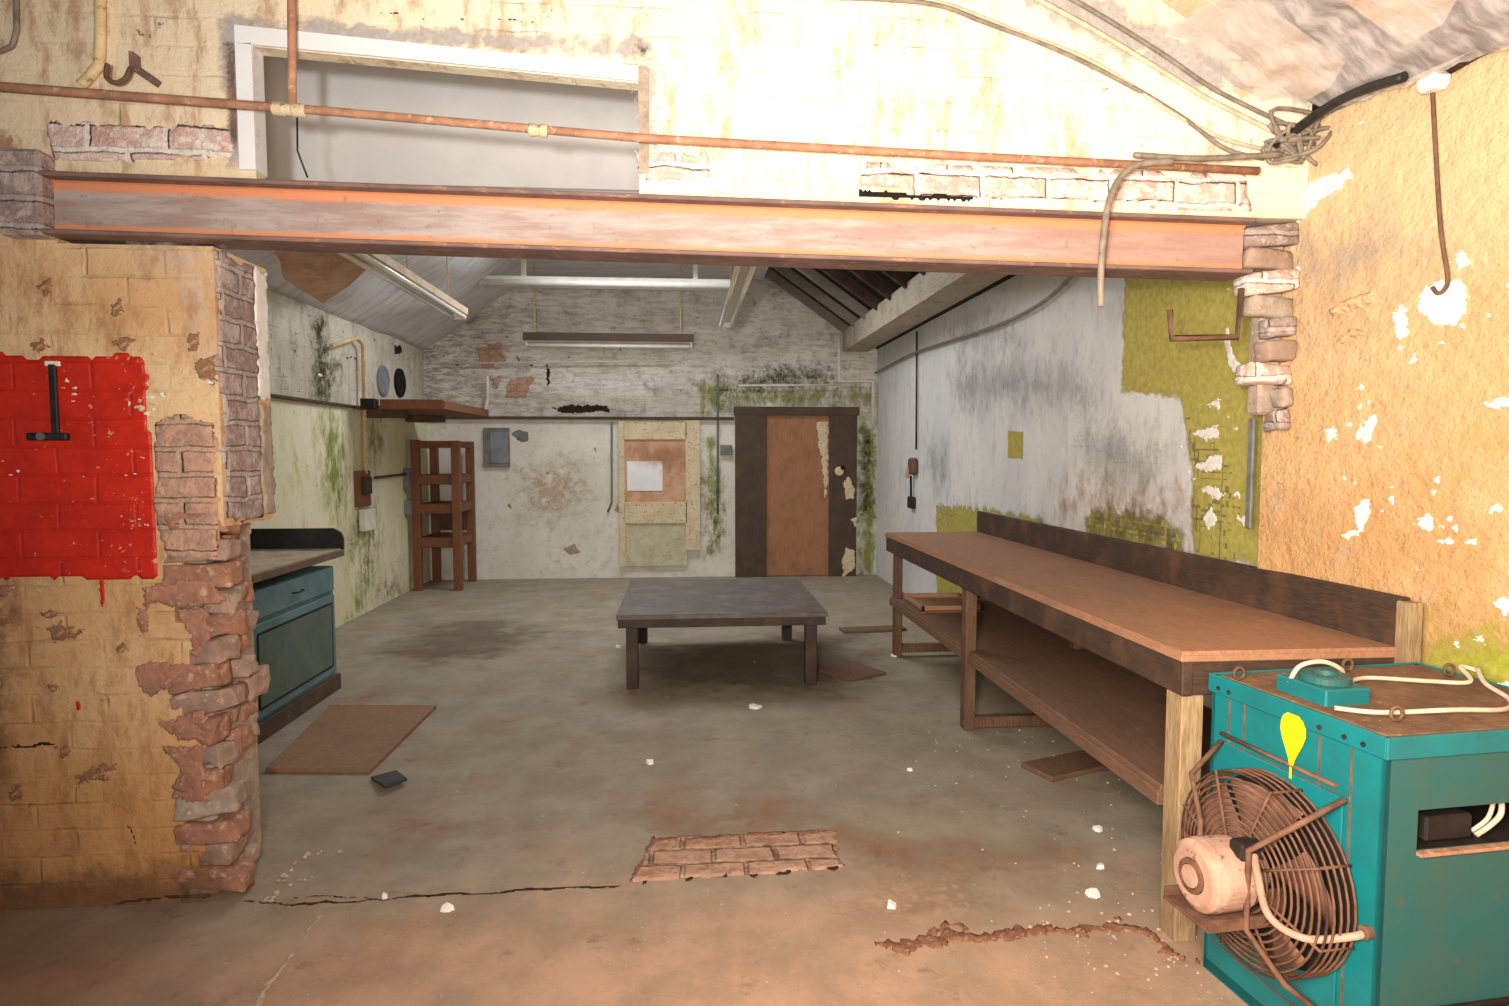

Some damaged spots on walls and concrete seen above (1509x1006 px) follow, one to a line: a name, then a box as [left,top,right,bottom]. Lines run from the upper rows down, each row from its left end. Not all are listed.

spalling [47,120,235,163]
spalling [858,162,1353,432]
peeling [1392,250,1471,364]
leakage [699,369,832,414]
peeling [1324,384,1382,449]
peeling [817,422,855,500]
spalling [116,249,276,895]
peeling [842,547,855,576]
peeling [1340,476,1394,540]
peeling [1412,513,1476,545]
peeling [1493,597,1509,621]
crack [115,886,619,1006]